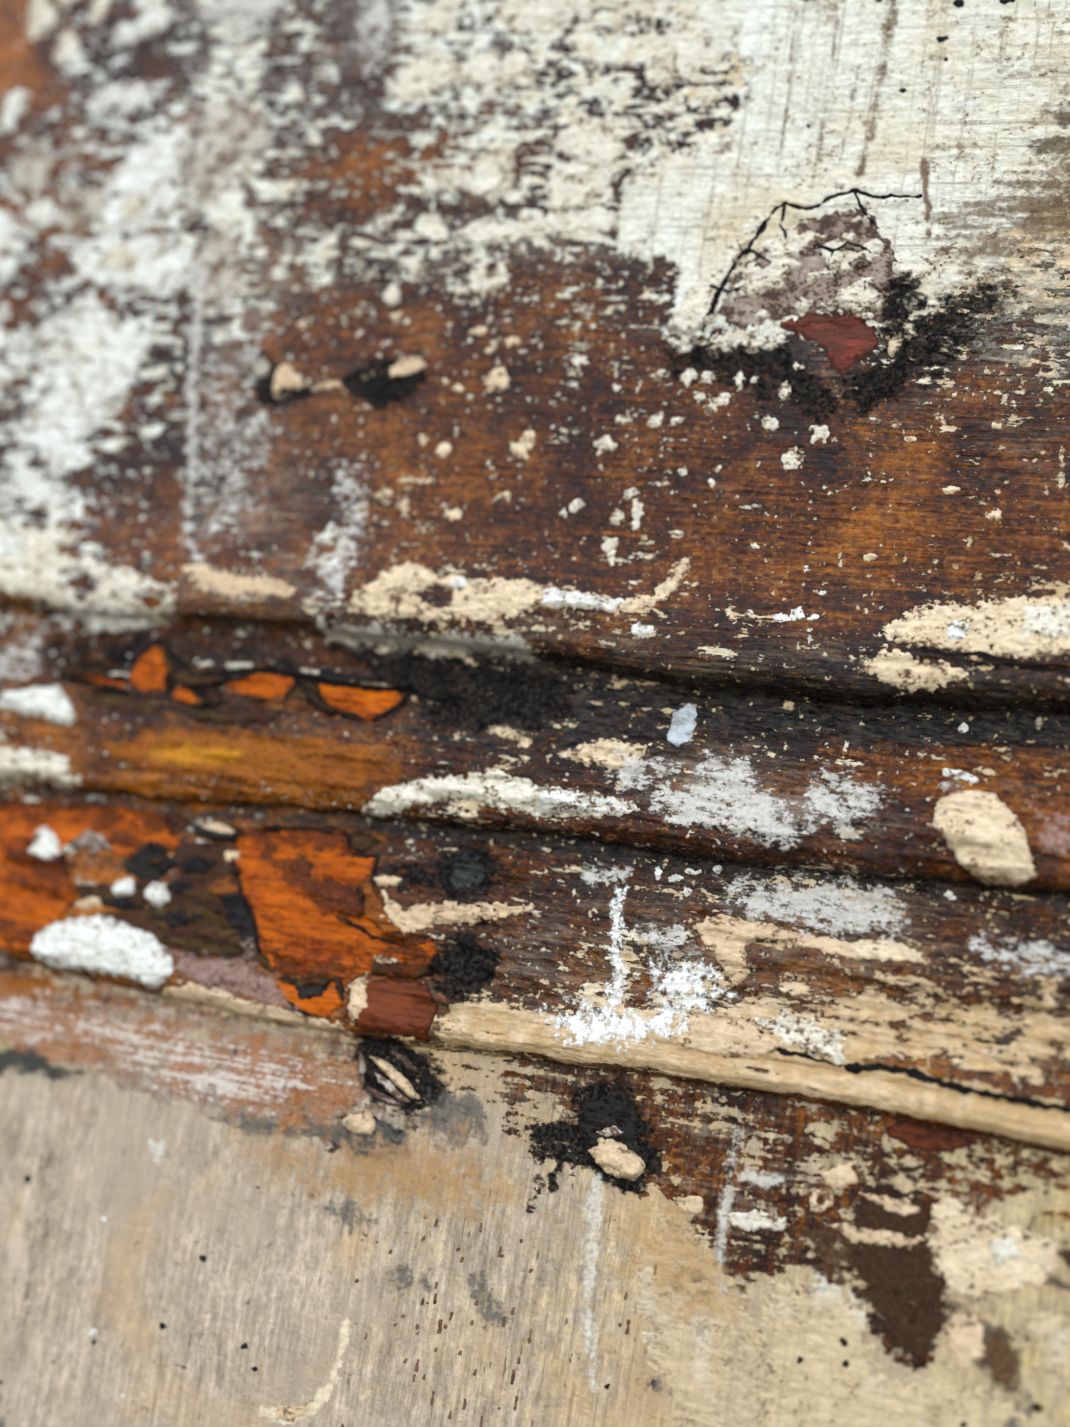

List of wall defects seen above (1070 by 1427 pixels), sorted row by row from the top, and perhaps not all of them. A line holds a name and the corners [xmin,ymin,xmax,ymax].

crack [700,188,923,333]
peeling [662,214,1021,357]
spalling [241,347,427,411]
peeling [541,587,625,613]
crack [57,635,440,721]
peeling [59,645,438,726]
crack [921,645,1070,675]
peeling [538,787,629,814]
peeling [0,796,535,1167]
crack [776,1046,1070,1113]
peeling [816,1162,920,1216]
peeling [824,1222,925,1250]